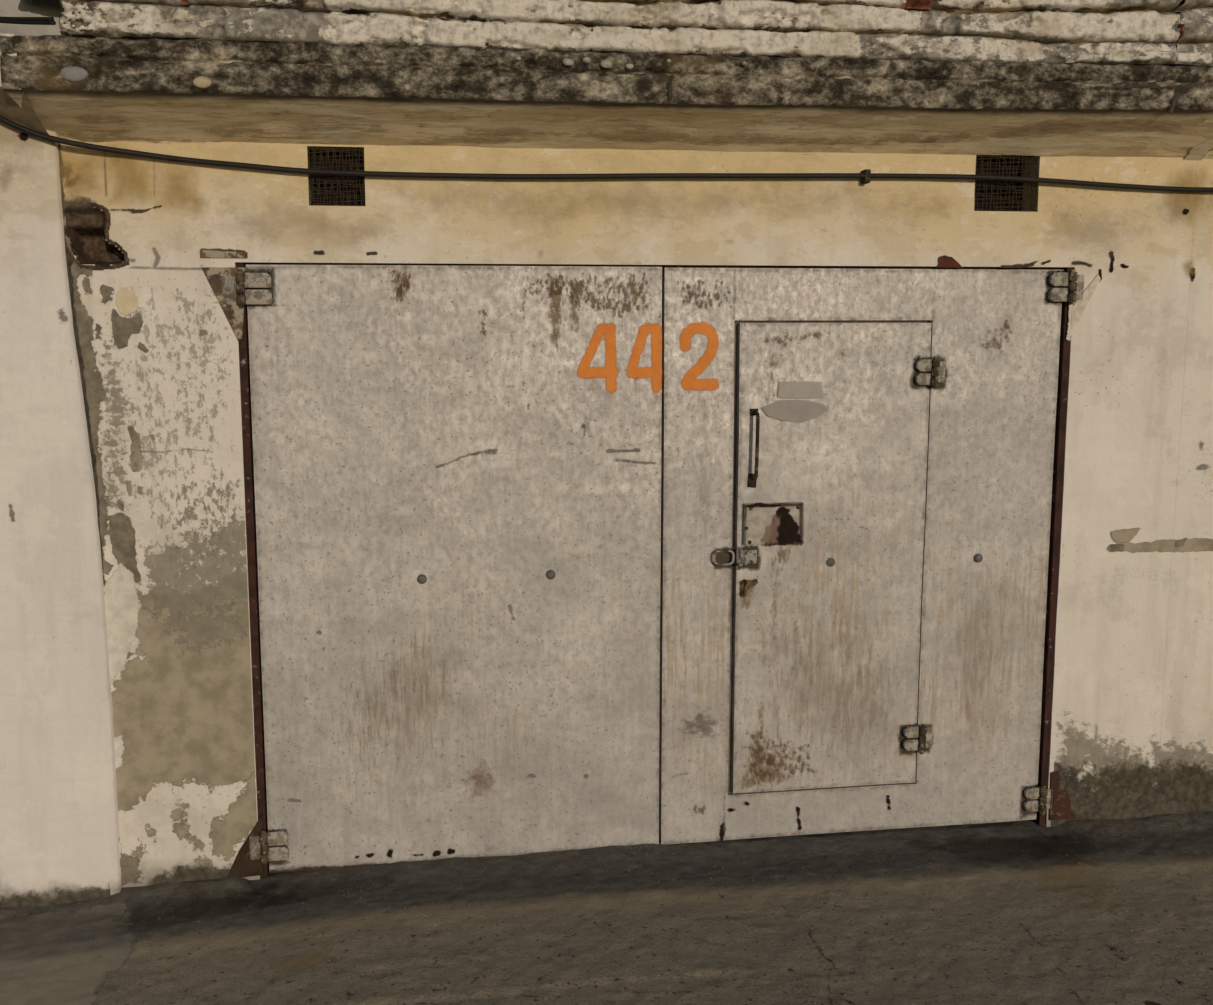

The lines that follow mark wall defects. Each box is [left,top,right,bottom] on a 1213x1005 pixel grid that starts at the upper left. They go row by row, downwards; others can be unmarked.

rust [522,273,653,347]
flaking render [64,203,257,886]
rust [747,503,802,583]
spalling [1107,528,1213,553]
rust [740,579,758,609]
rust [742,702,816,787]
rust [720,802,750,841]
water stain [1052,762,1213,827]